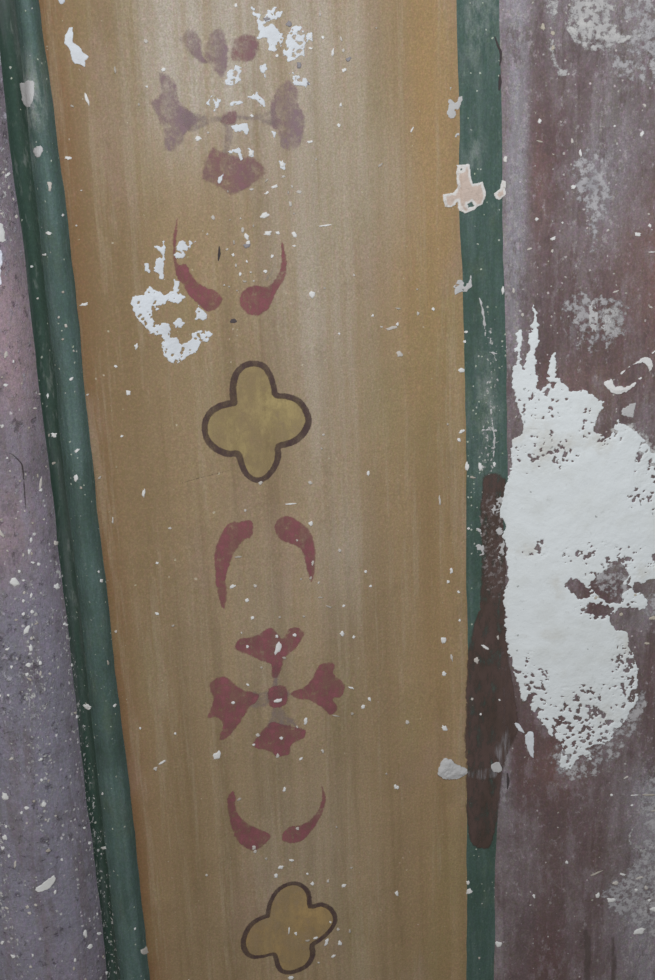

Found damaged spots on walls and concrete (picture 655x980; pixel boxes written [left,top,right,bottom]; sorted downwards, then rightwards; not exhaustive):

peeling [225,65,242,86]
peeling [206,92,265,135]
peeling [251,6,324,88]
peeling [228,147,254,161]
flaking render [443,164,506,213]
peeling [131,240,213,364]
peeling [223,212,269,291]
flaking render [453,275,472,295]
peeling [465,298,655,849]
peeling [10,570,57,852]
peeling [0,822,37,979]
peeling [35,875,56,894]